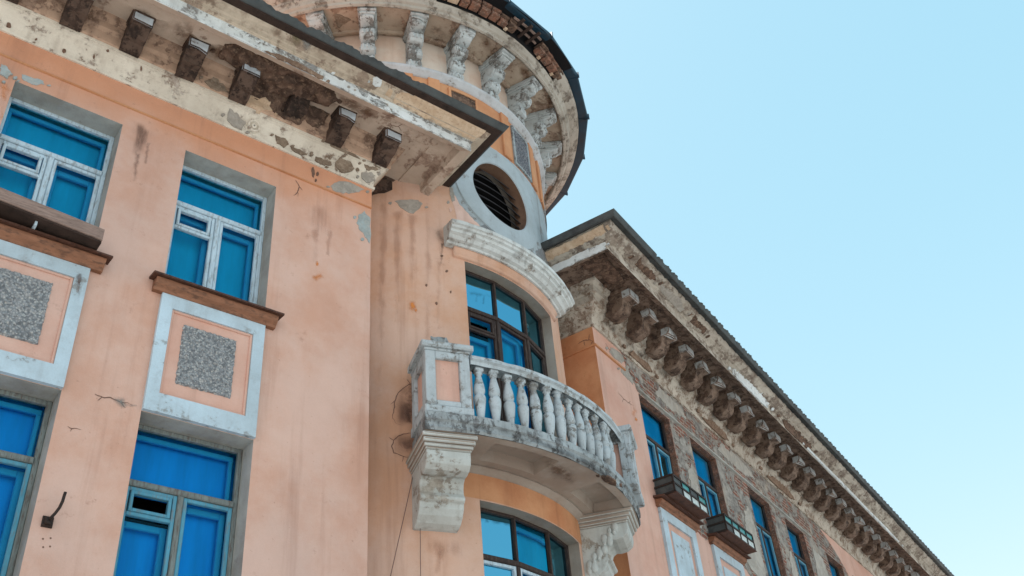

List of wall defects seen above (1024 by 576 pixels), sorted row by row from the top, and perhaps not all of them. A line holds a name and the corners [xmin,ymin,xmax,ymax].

spalling [199,34,394,194]
peeling [353,211,371,243]
peeling [388,199,428,214]
peeling [628,255,710,338]
crack [389,380,412,461]
flaking render [605,344,848,576]